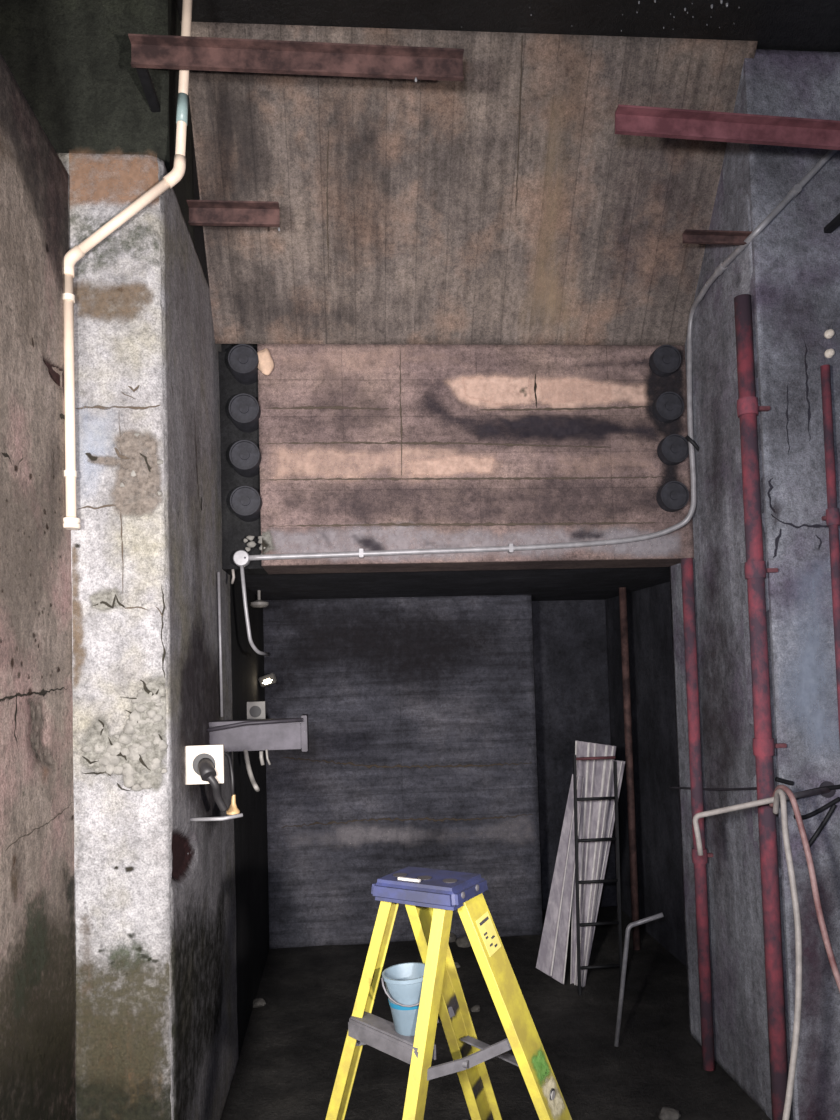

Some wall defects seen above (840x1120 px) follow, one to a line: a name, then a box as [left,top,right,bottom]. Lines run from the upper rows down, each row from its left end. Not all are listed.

water stain [426,349,685,441]
spalling [86,431,163,515]
water stain [646,462,679,503]
crack [768,478,828,558]
crack [0,687,68,754]
spalling [81,677,168,791]
water stain [0,872,76,1083]